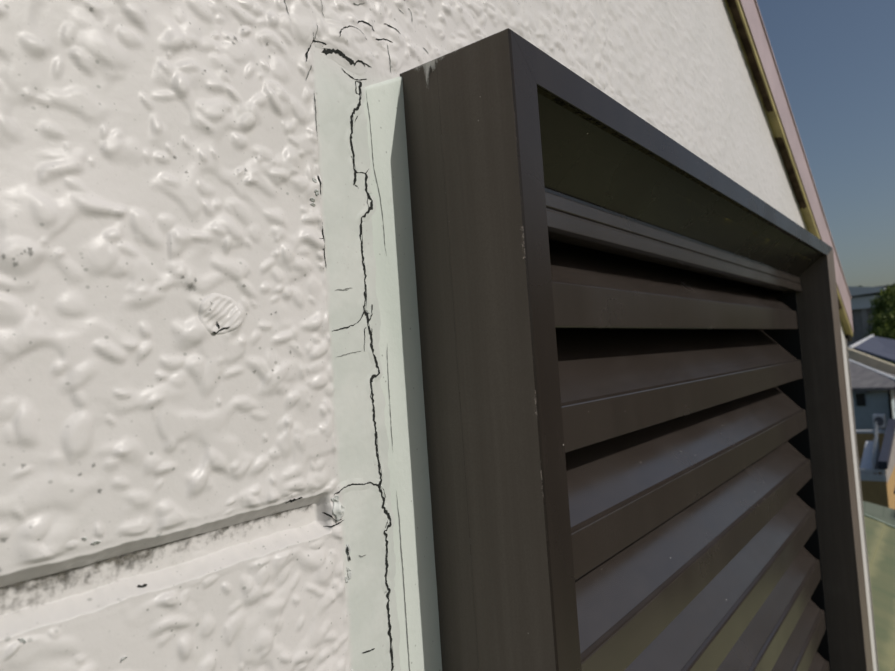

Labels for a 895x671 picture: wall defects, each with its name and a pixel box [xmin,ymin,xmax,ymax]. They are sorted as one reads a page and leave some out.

crack [300,0,413,671]
leakage [217,504,311,533]
leakage [0,533,204,594]